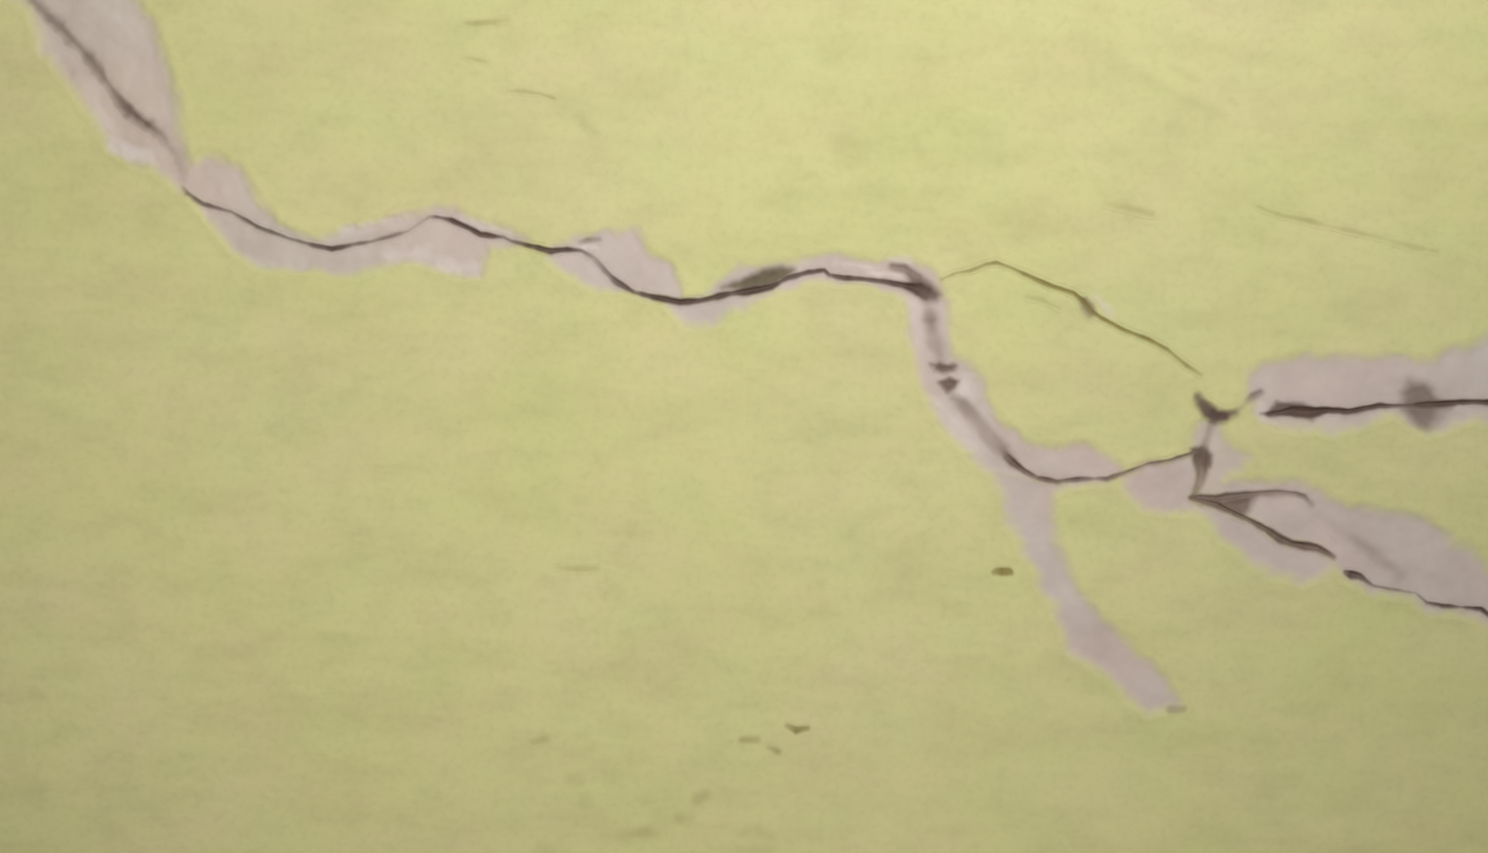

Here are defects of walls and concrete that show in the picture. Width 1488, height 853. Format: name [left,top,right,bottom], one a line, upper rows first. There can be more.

peeling [0,0,534,284]
crack [21,0,1488,621]
peeling [541,220,1488,724]